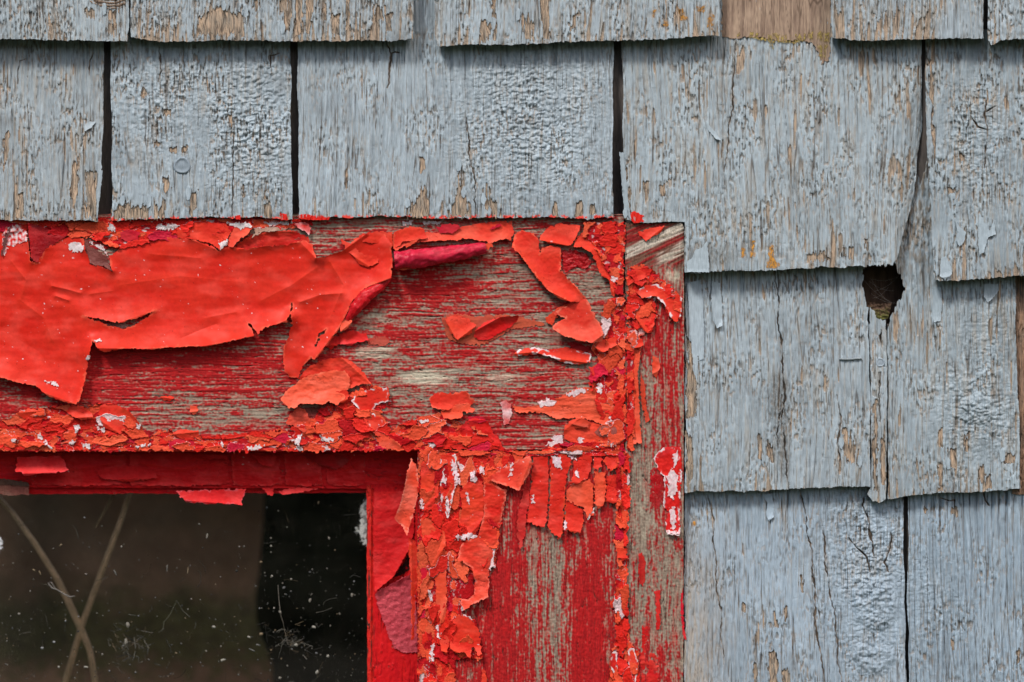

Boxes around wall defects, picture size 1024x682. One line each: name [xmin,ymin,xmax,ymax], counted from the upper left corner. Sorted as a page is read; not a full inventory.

peeling [2,131,10,171]
peeling [0,152,723,682]
crack [777,289,892,675]